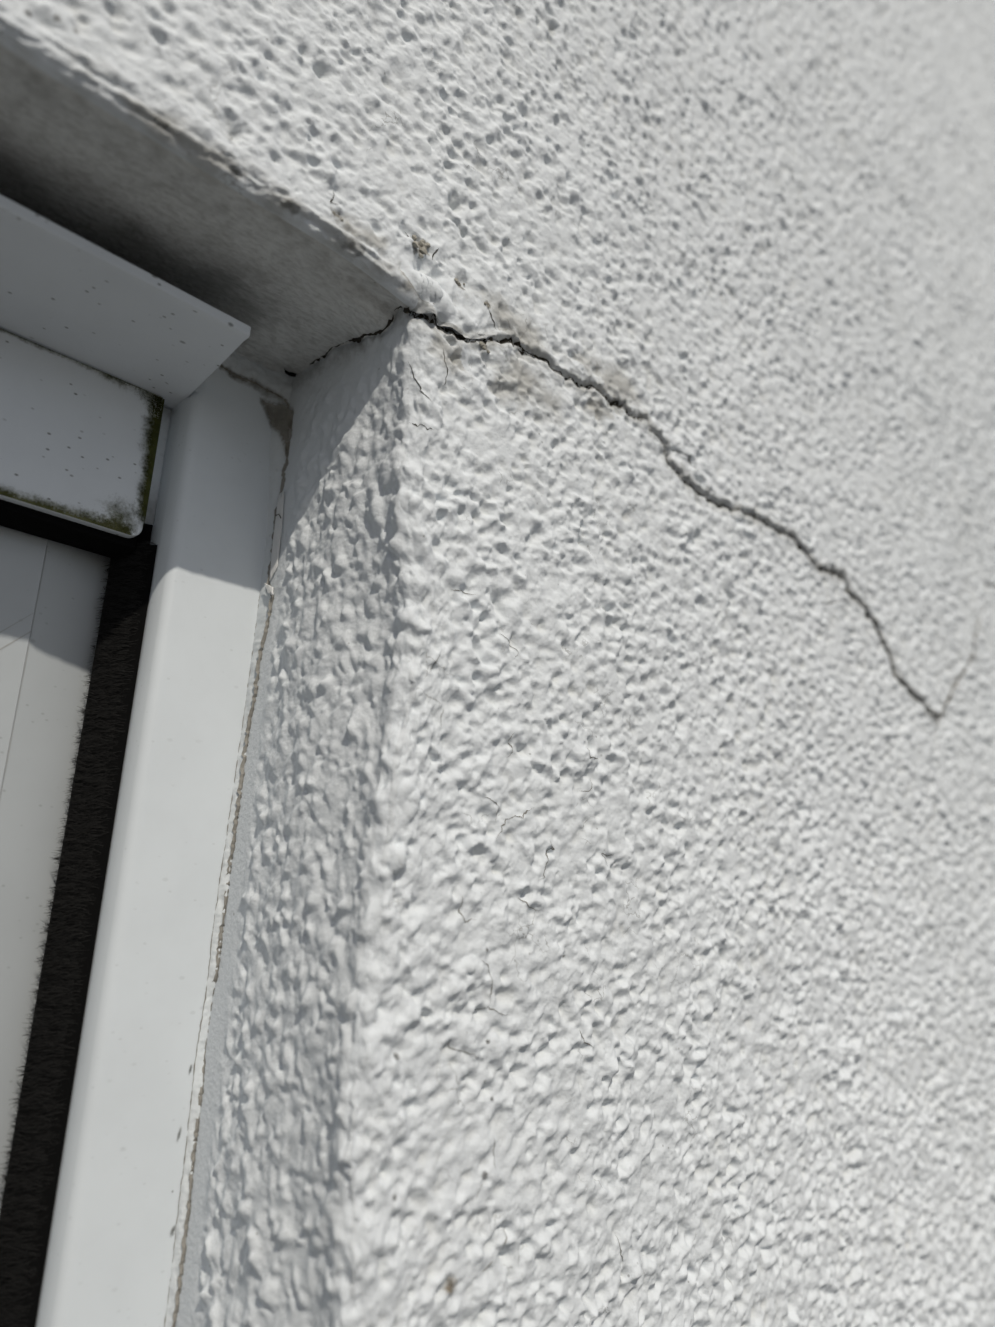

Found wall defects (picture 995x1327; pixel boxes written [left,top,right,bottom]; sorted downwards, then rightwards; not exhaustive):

crack [310,306,995,721]